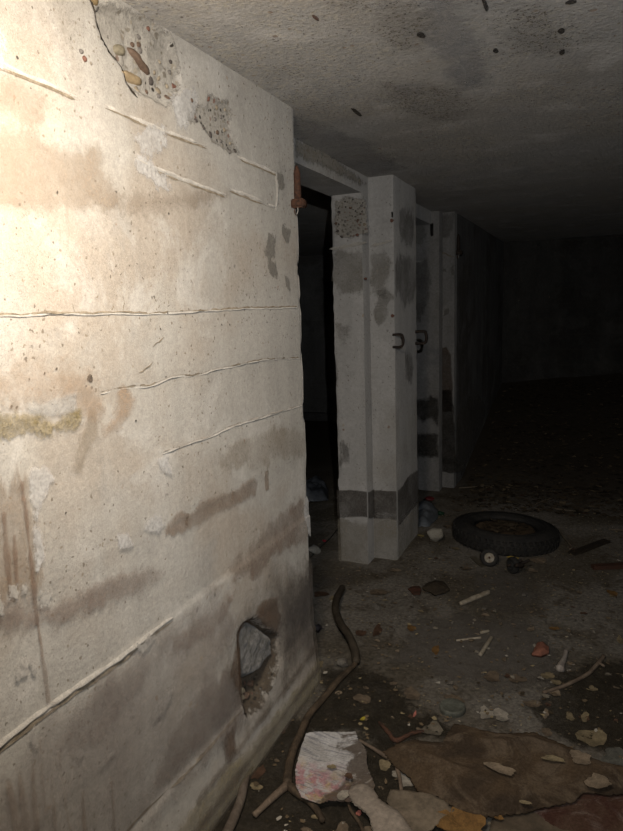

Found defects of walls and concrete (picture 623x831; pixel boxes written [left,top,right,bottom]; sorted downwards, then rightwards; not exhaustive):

spalling [90,0,182,107]
spalling [188,94,238,154]
water stain [135,126,169,191]
crack [0,297,297,318]
crack [102,337,300,394]
spalling [237,618,279,714]